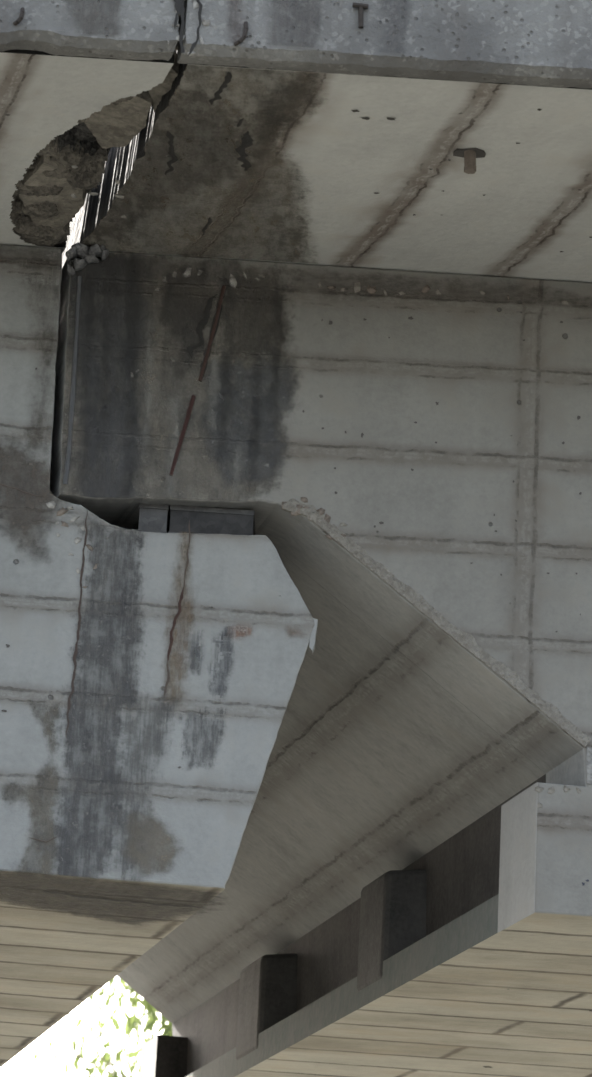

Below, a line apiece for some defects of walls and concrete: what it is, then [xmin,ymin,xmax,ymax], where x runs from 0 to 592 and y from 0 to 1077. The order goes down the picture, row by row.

spalling [9,0,211,275]
crack [165,131,178,175]
crack [174,0,202,56]
crack [209,72,232,105]
crack [235,118,253,171]
damp [0,65,468,555]
crack [66,510,88,738]
damp [0,525,223,924]
crack [164,520,190,696]
damp [190,629,233,695]